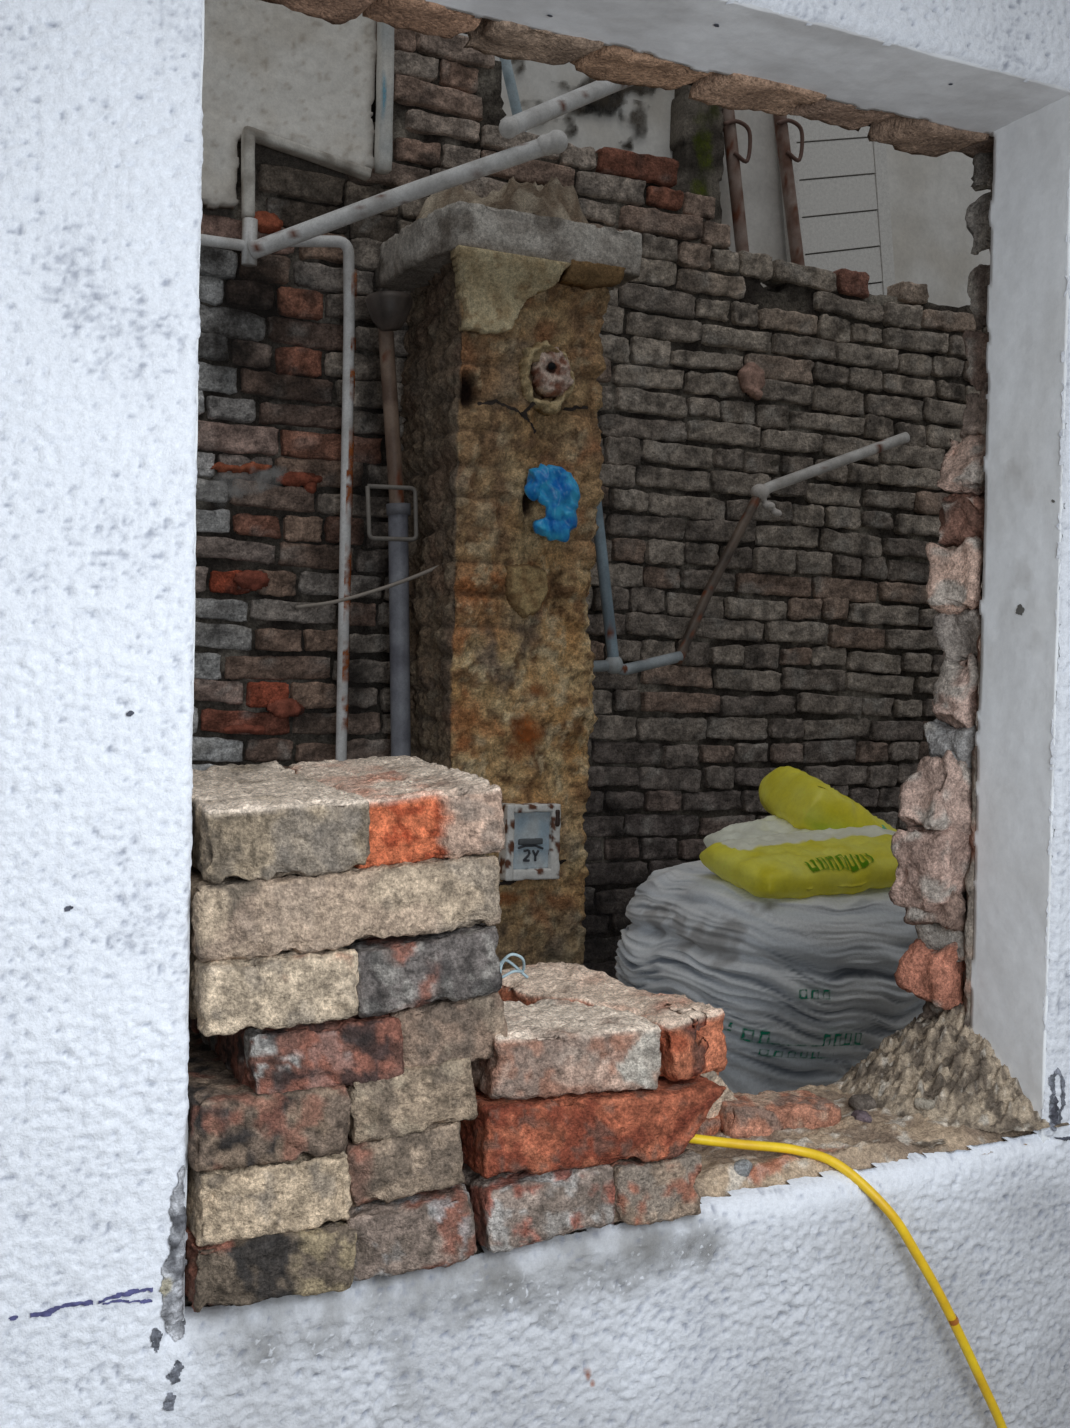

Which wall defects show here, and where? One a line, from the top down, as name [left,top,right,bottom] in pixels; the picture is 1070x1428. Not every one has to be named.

spalling [254,211,283,234]
flaking render [450,245,626,335]
corrosion [346,441,354,507]
flaking render [150,1165,188,1353]
flaking render [162,1360,184,1411]